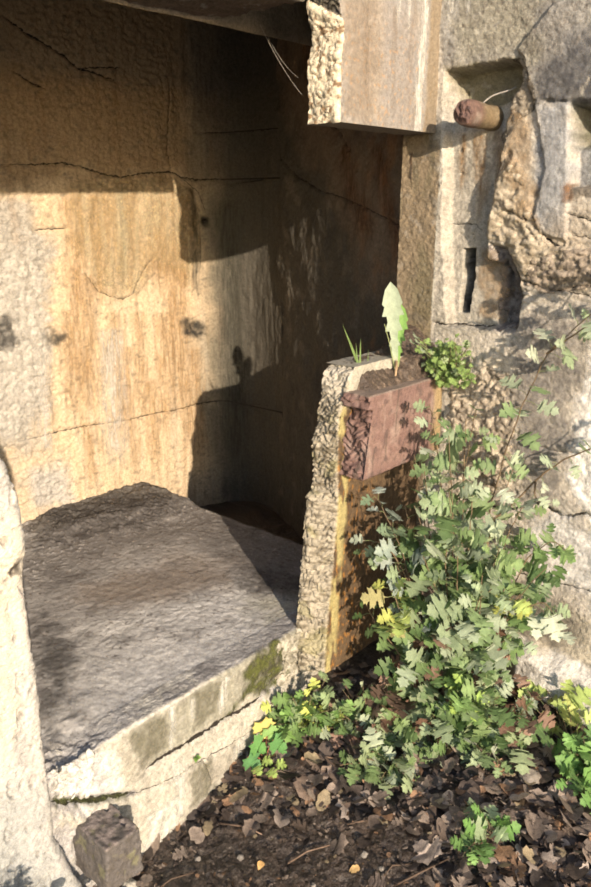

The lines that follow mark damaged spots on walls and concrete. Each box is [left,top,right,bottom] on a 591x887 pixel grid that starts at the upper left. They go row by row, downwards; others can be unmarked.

crack [8,20,119,79]
crack [1,77,400,226]
crack [10,400,282,443]
crack [51,697,259,806]